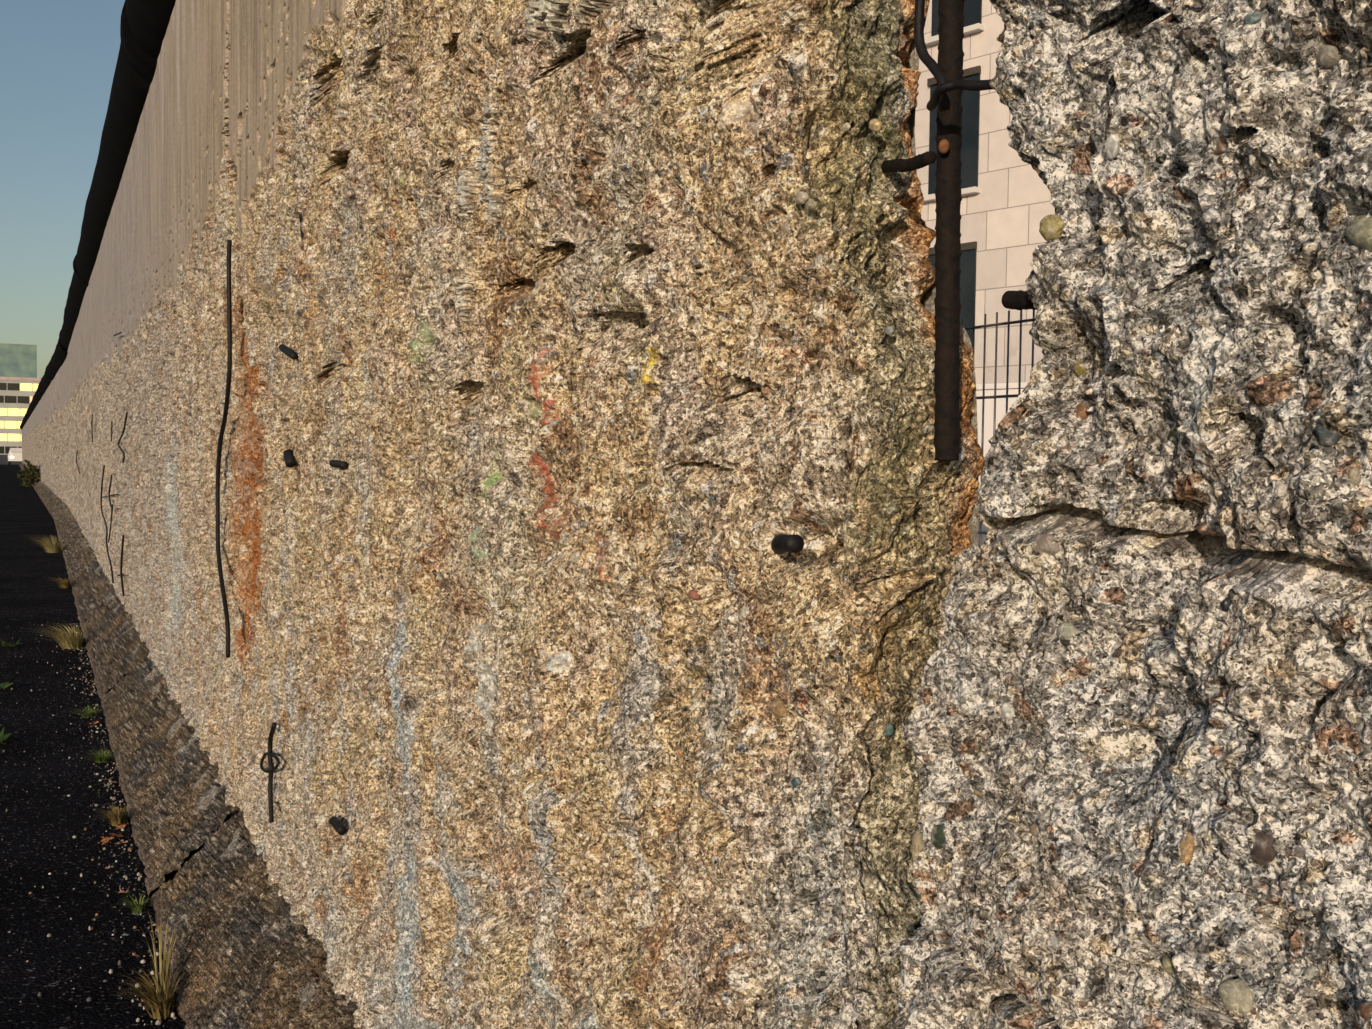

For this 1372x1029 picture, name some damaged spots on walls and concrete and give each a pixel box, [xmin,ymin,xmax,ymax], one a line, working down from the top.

rust [232,358,274,670]